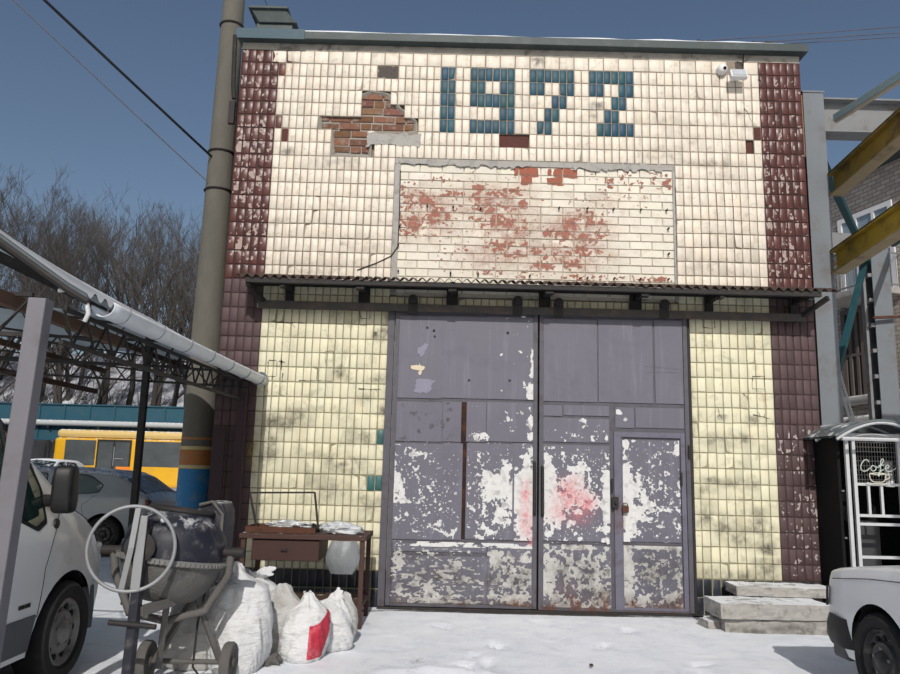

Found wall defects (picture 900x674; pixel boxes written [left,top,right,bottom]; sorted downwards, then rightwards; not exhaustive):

spalling [229,49,292,262]
spalling [318,91,417,158]
peeling [399,167,672,288]
spalling [746,93,811,284]
peeling [367,476,382,491]
peeling [390,343,533,606]
peeling [622,439,683,609]
spalling [777,429,814,477]
spalling [780,491,820,576]